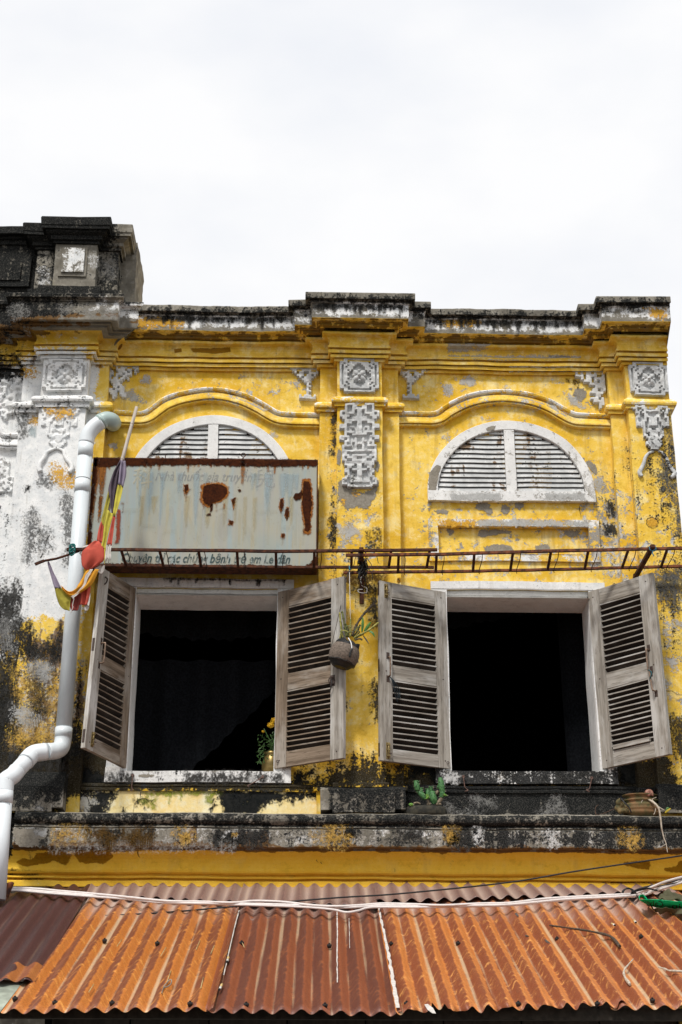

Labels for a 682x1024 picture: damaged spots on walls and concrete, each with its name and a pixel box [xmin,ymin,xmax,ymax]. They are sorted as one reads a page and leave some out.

leakage [426,319,582,333]
peeling [28,407,76,426]
peeling [49,461,76,490]
peeling [428,465,441,490]
leakage [656,415,681,536]
corrosion [88,457,318,545]
peeling [475,503,524,515]
leakage [21,492,74,567]
peeling [478,529,513,551]
leakage [0,578,63,771]
leakage [169,768,316,851]
corrosion [0,962,42,982]